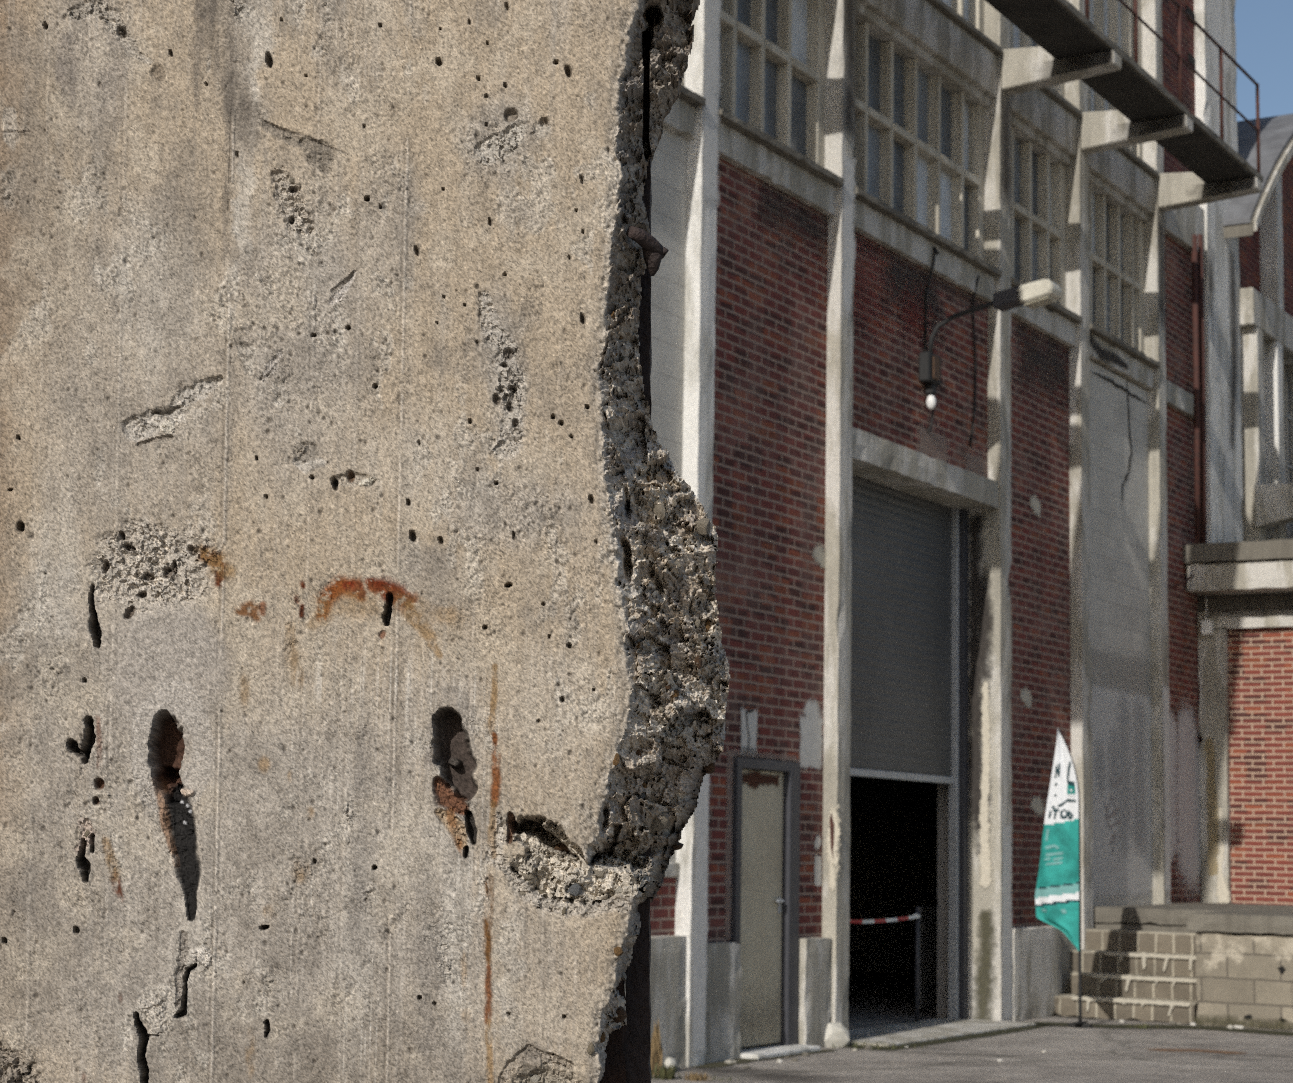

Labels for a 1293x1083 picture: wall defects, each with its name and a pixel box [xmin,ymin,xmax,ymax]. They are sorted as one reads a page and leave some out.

crack [1092,372,1149,509]
spalling [471,0,730,1083]
corrosion [282,572,468,693]
damp [968,514,993,835]
corrosion [432,776,470,858]
peeling [434,807,469,847]
corrosion [485,662,503,844]
crack [133,930,213,1083]
corrosion [459,872,496,1083]